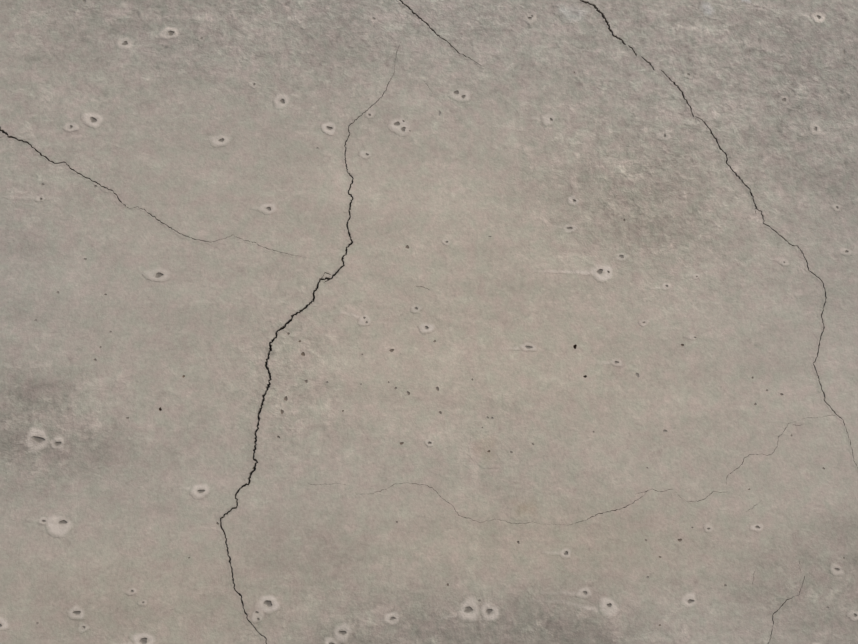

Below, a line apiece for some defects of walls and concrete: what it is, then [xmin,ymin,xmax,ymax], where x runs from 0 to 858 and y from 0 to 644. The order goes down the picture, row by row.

crack [0,42,401,644]
crack [397,0,485,69]
crack [575,0,858,502]